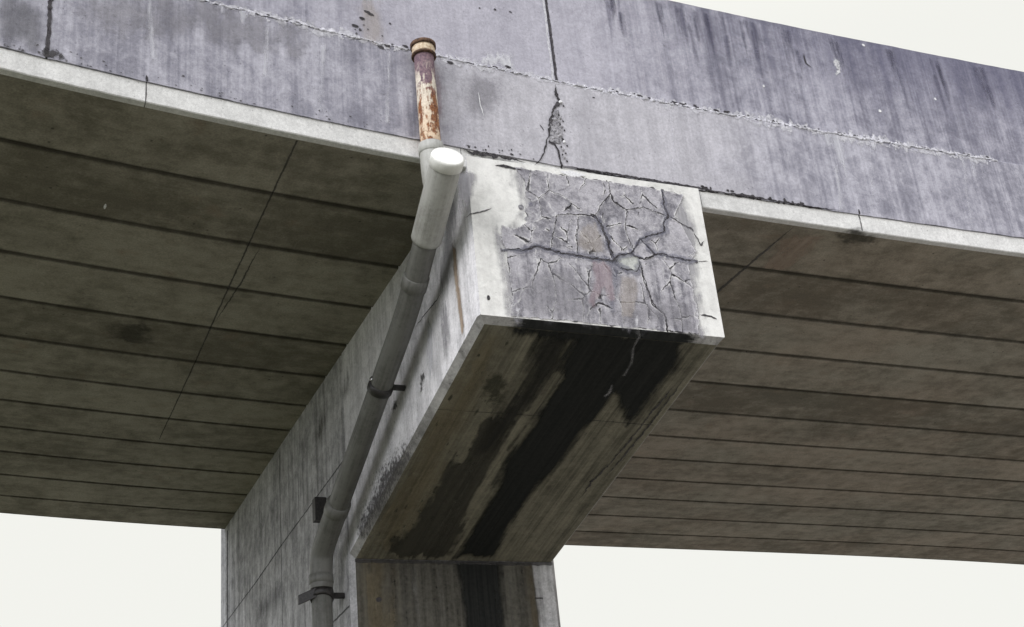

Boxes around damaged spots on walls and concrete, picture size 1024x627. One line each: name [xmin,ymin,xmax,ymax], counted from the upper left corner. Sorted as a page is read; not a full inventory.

crack [159,140,298,439]
damp [355,200,704,627]
crack [495,84,568,175]
crack [500,180,705,333]